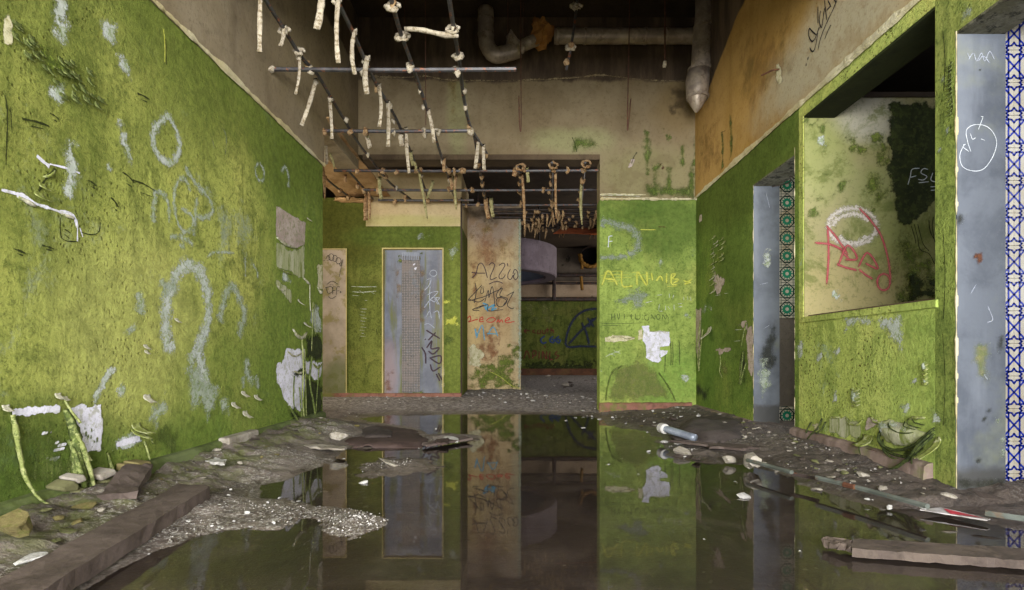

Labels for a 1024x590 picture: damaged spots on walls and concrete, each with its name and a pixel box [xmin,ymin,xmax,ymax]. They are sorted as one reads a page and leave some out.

water stain [647,144,695,197]
peeling [276,206,323,420]
peeling [605,325,680,371]
peeling [1,393,155,504]